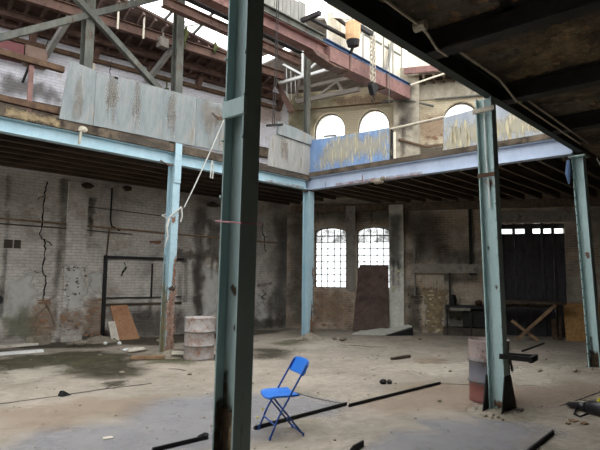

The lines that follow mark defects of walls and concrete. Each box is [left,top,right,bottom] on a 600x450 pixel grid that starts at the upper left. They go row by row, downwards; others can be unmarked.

spalling [6,108,60,127]
peeling [320,128,388,169]
peeling [427,119,477,150]
peeling [496,113,540,140]
crack [35,182,55,326]
damp [177,250,198,262]
damp [207,222,220,258]
spalling [59,267,108,337]
corrosion [159,257,177,352]
spalling [408,286,448,334]